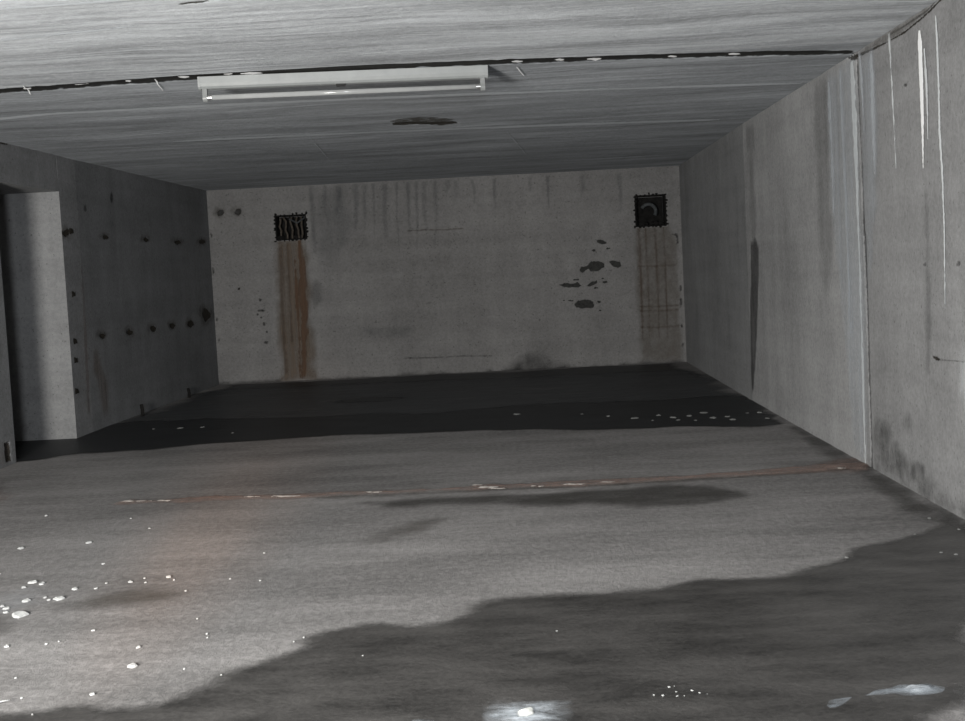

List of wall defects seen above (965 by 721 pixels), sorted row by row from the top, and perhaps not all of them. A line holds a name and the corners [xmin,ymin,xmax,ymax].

damp [918,15,945,290]
corrosion [279,240,314,380]
damp [14,242,780,462]
spalling [563,300,601,311]
spalling [561,240,621,289]
damp [810,56,929,511]
damp [0,517,965,721]